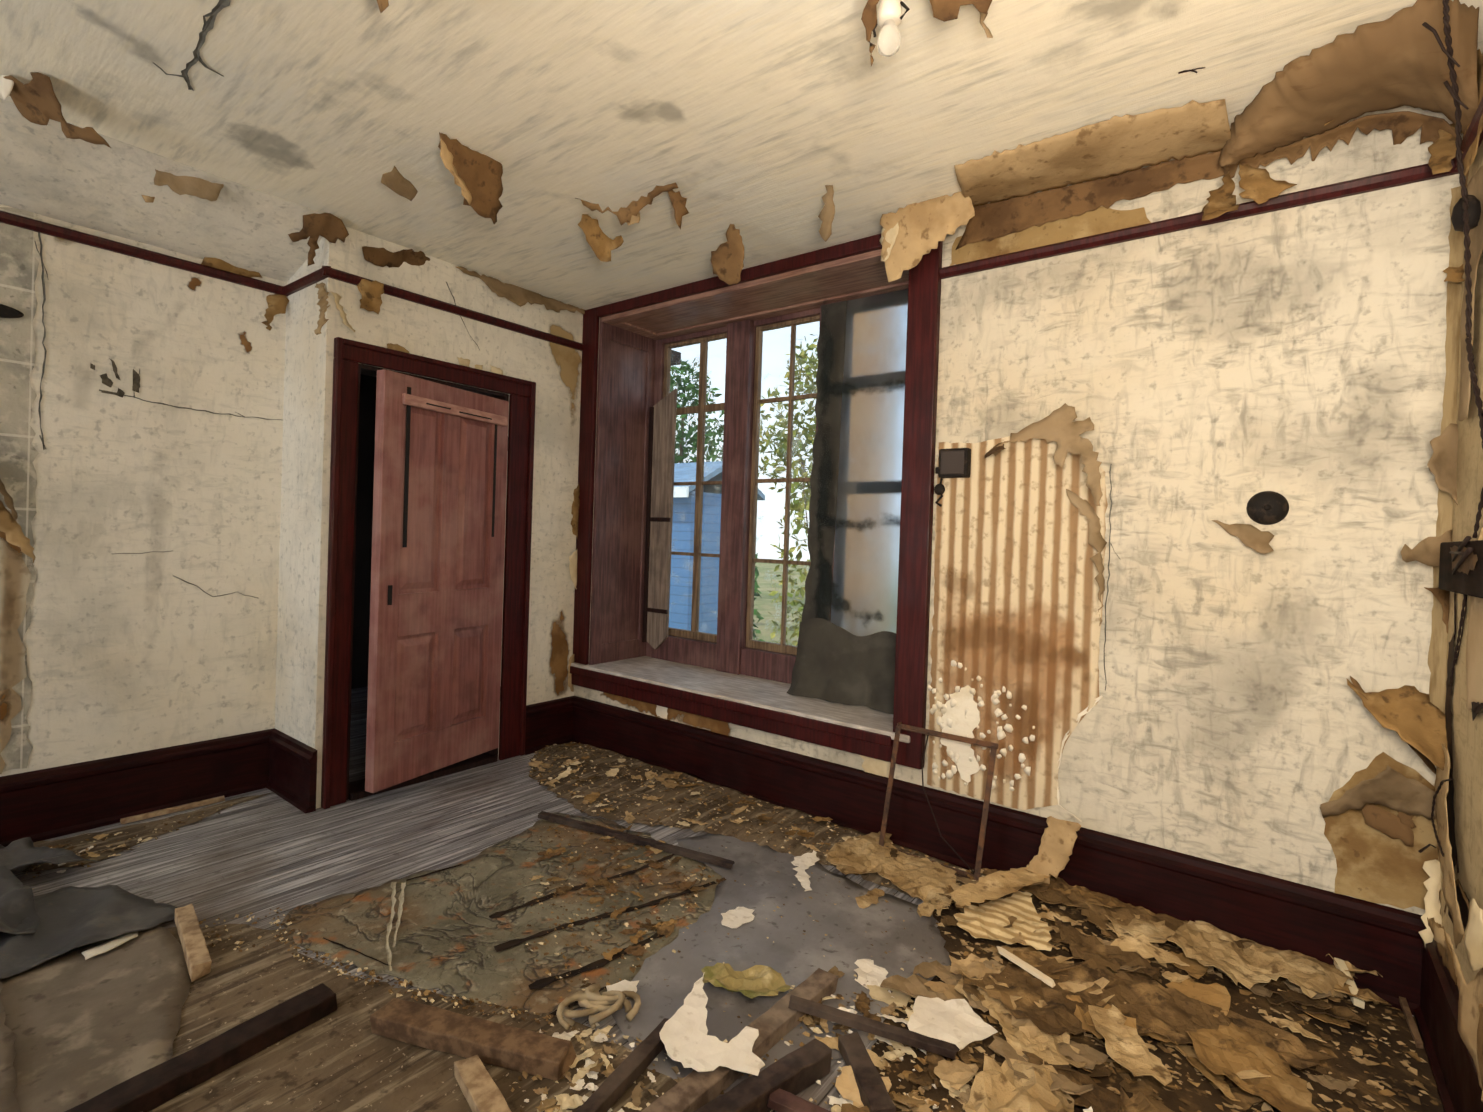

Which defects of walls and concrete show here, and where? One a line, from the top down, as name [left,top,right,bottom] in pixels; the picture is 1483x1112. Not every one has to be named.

crack [153,0,231,91]
flaking render [950,206,1151,266]
flaking render [0,207,39,772]
flaking render [927,436,1108,810]
flaking render [1319,490,1478,910]